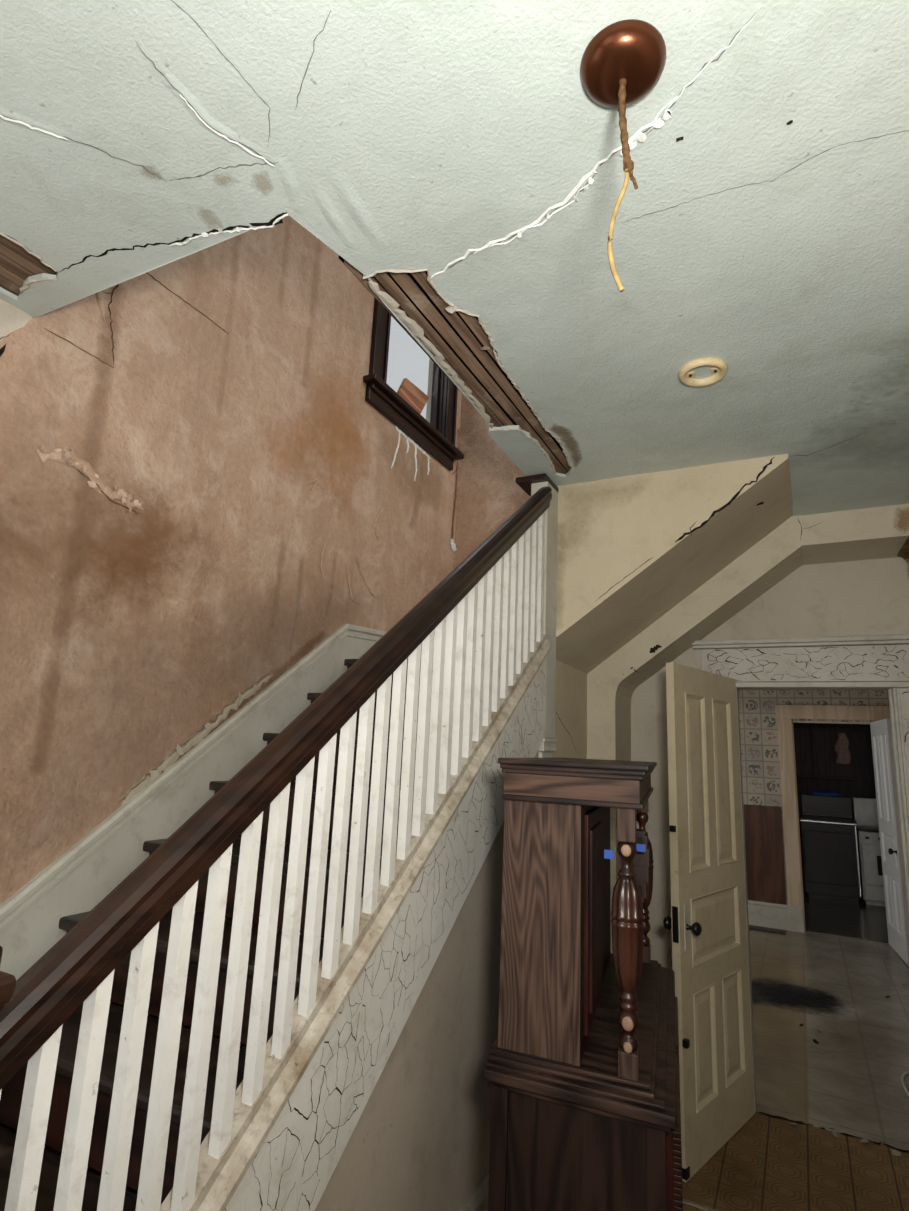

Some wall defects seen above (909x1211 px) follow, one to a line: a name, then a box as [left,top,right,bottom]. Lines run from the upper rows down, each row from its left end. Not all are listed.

flaking render [0,232,57,295]
crack [0,0,331,181]
crack [58,212,288,273]
crack [430,5,762,279]
crack [623,130,909,223]
flaking render [363,269,572,476]
crack [595,436,856,602]
water stain [204,634,323,738]
crack [707,647,909,742]
crack [252,671,576,1211]